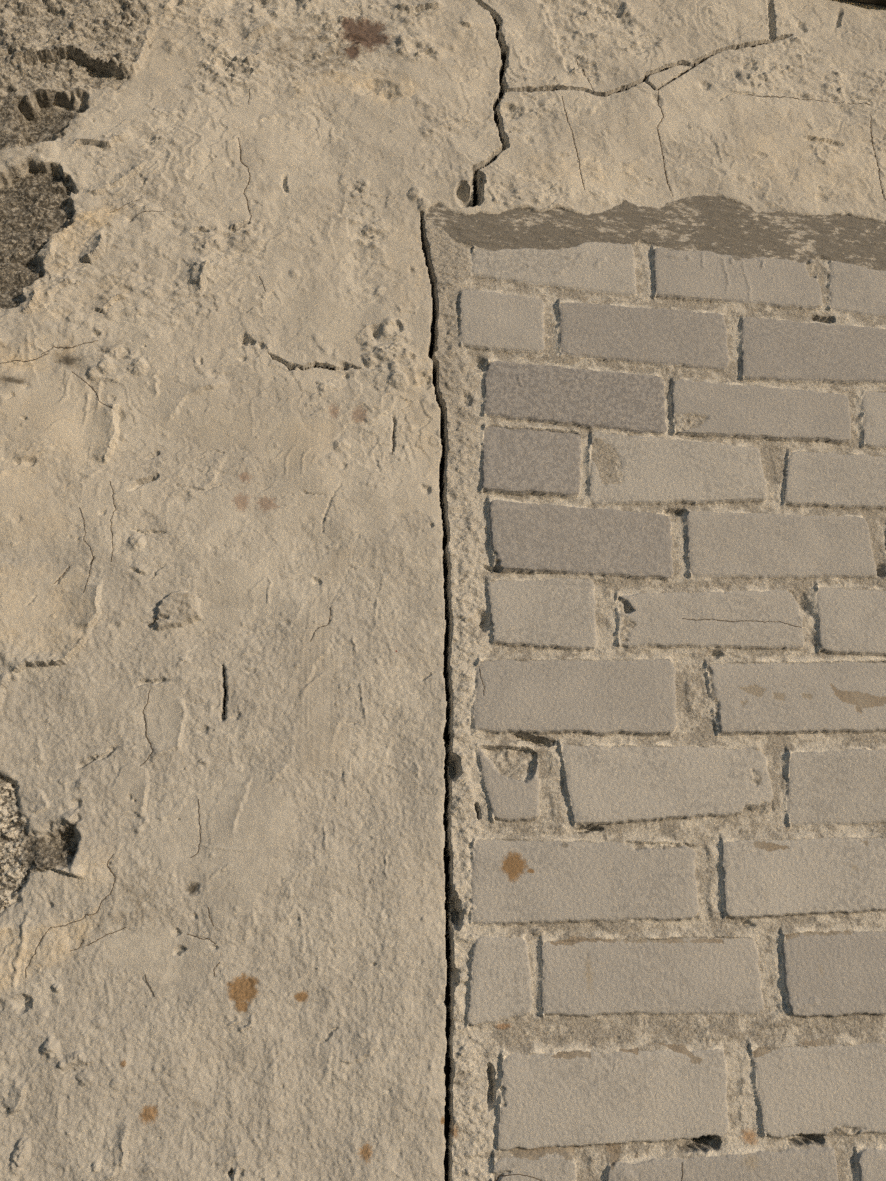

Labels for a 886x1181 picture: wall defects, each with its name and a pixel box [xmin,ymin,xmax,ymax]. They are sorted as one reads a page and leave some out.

spalling [0,0,165,96]
crack [473,15,788,207]
spalling [0,166,73,317]
spalling [0,577,110,718]
crack [420,228,451,1181]
spalling [480,742,539,785]
crack [683,618,802,628]
spalling [0,775,82,913]
corrosion [494,845,536,885]
corrosion [222,969,265,1014]